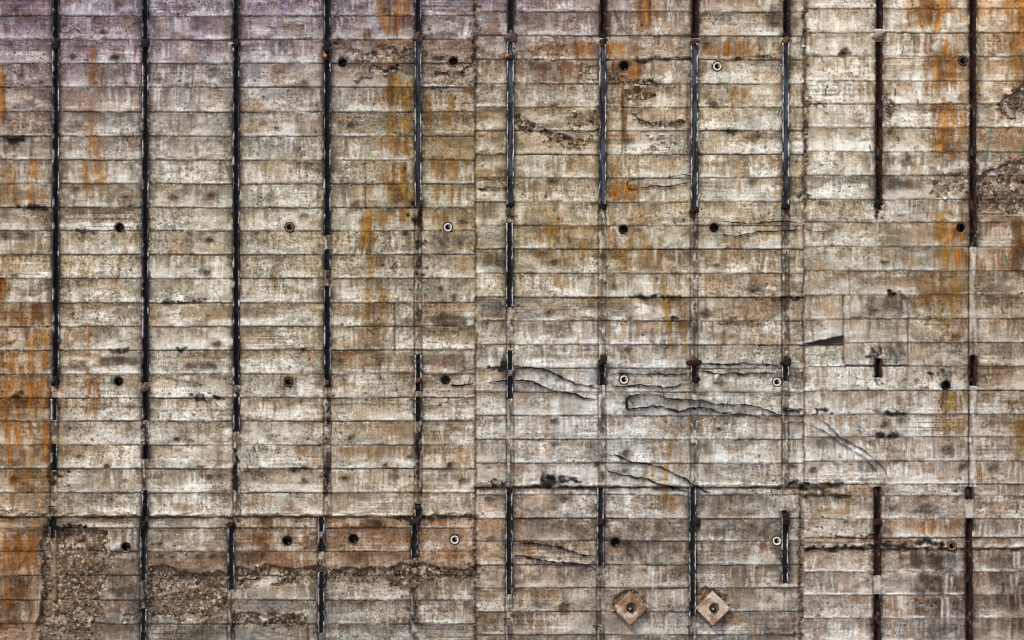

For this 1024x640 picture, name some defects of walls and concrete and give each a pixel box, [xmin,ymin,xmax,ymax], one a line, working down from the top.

rust [83,49,104,196]
rust [364,0,415,222]
rust [908,0,967,158]
spalling [994,84,1024,127]
spalling [929,156,1024,217]
rust [361,210,388,321]
rust [0,278,52,488]
crack [424,360,887,475]
crack [606,453,710,493]
spalling [35,524,115,640]
spalling [147,546,484,631]
crack [515,542,597,568]